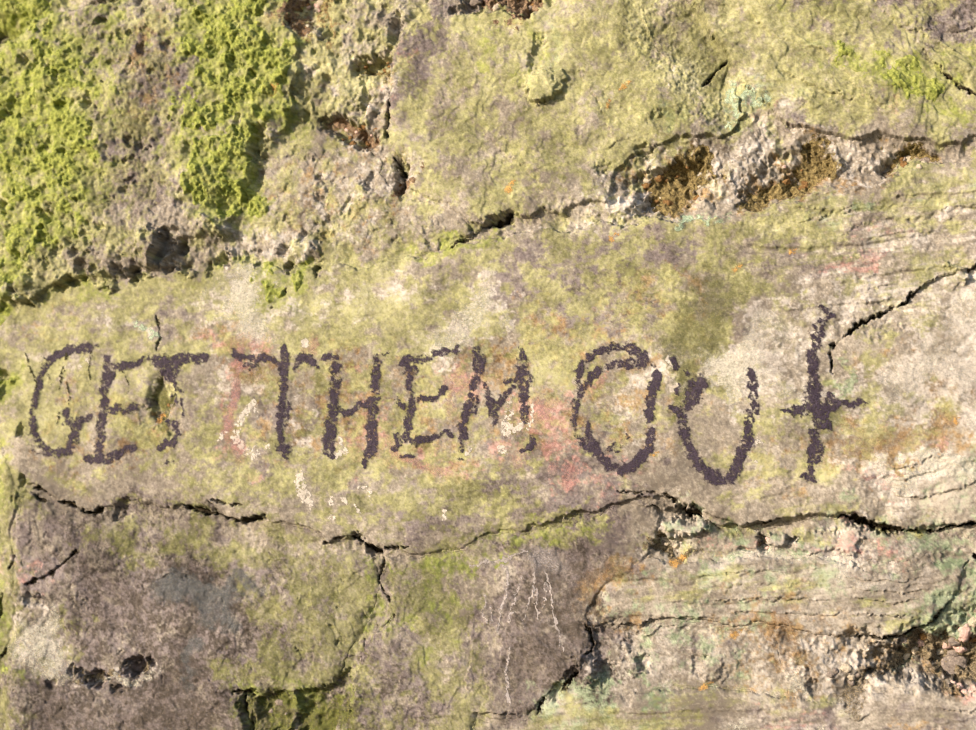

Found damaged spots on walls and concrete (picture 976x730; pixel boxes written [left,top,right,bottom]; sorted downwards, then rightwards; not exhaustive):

crack [925,53,976,96]
crack [395,159,408,189]
crack [494,213,514,228]
crack [830,290,918,368]
crack [35,485,105,515]
crack [188,499,263,523]
crack [618,491,702,517]
crack [8,549,78,585]
crack [324,535,405,618]